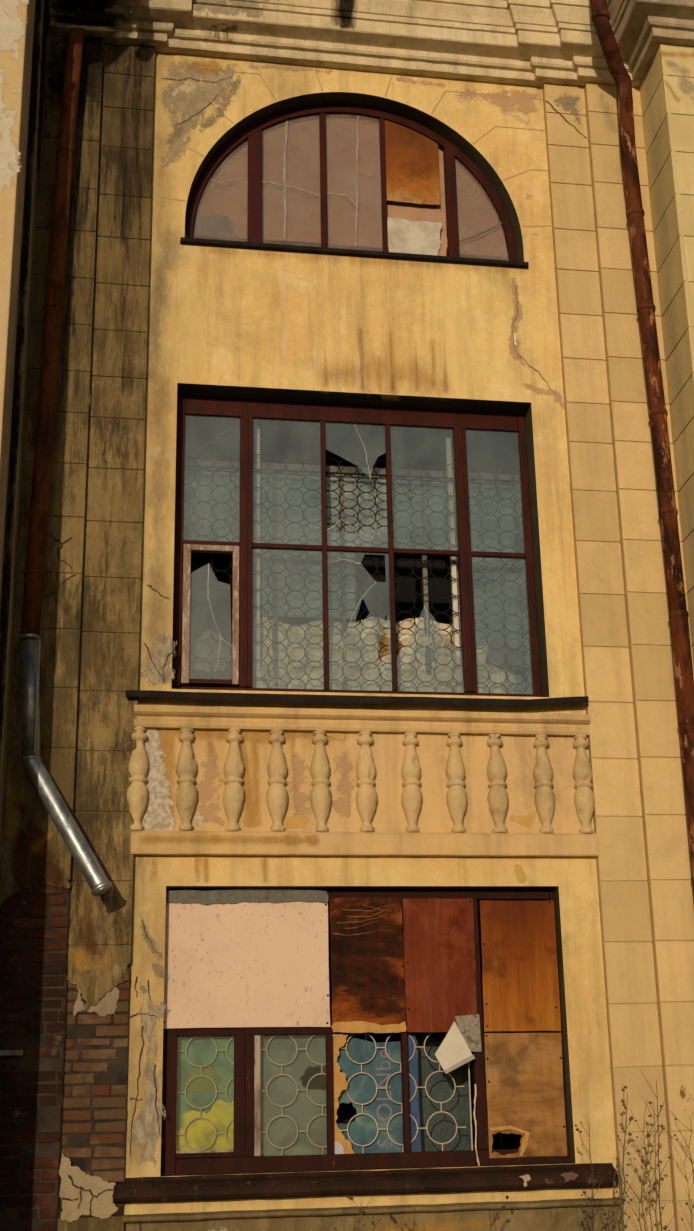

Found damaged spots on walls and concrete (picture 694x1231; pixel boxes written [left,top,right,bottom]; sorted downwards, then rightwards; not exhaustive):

peeling [0,0,29,192]
water stain [78,36,101,133]
water stain [107,52,147,247]
peeling [161,61,332,166]
crack [43,533,76,597]
peeling [141,729,176,830]
flaking render [0,880,166,1231]